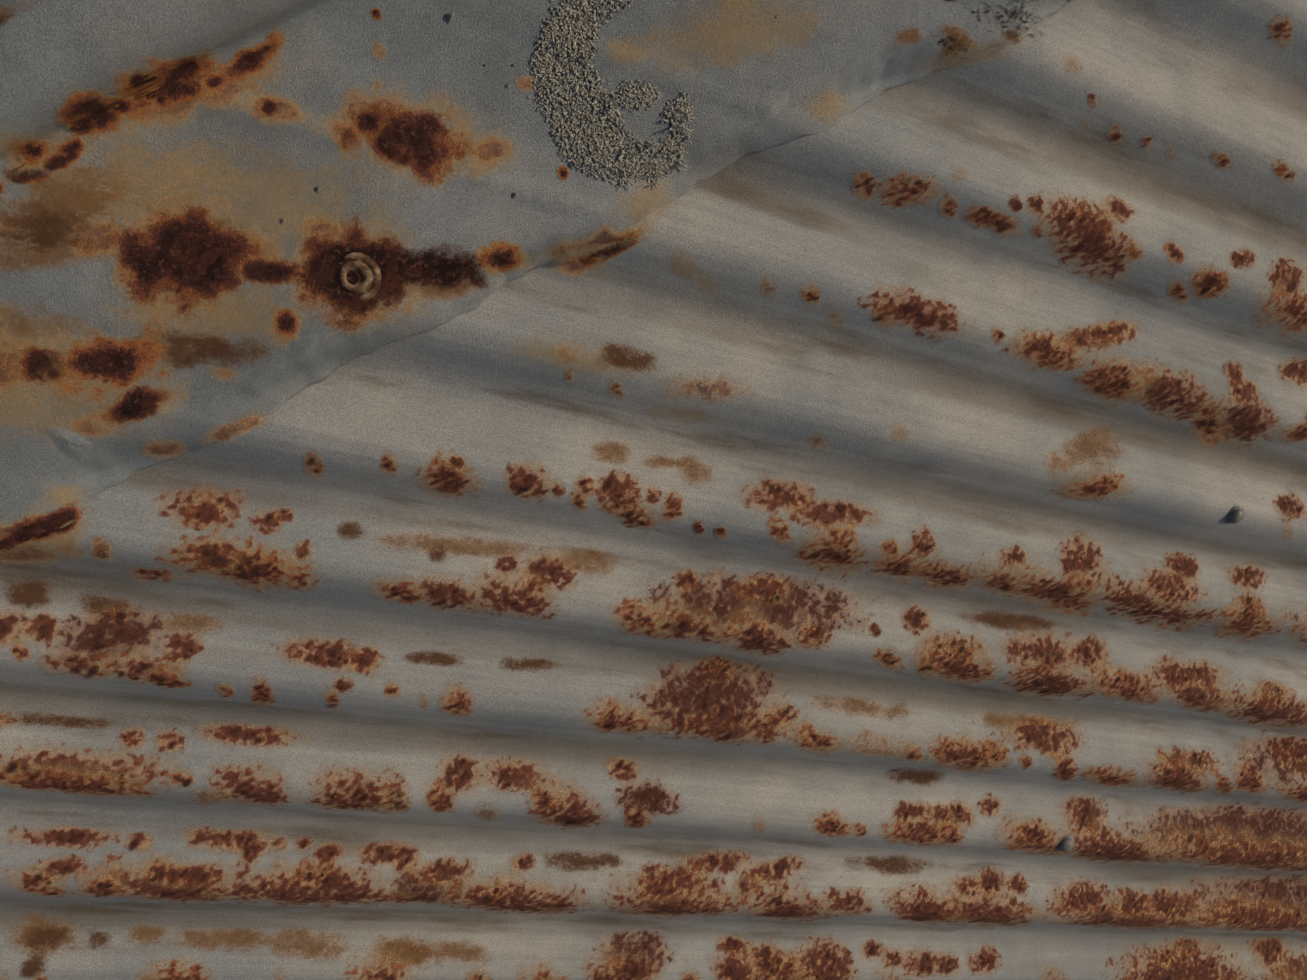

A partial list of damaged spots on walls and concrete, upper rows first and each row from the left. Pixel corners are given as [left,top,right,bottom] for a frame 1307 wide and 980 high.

rust [1268,15,1293,46]
rust [557,166,569,180]
rust [1273,159,1296,182]
rust [0,29,528,436]
rust [545,226,645,275]
rust [858,288,965,339]
rust [854,171,1144,282]
rust [1164,242,1185,264]
rust [1170,249,1255,302]
rust [1253,258,1307,336]
rust [991,321,1307,449]
rust [0,480,1307,980]